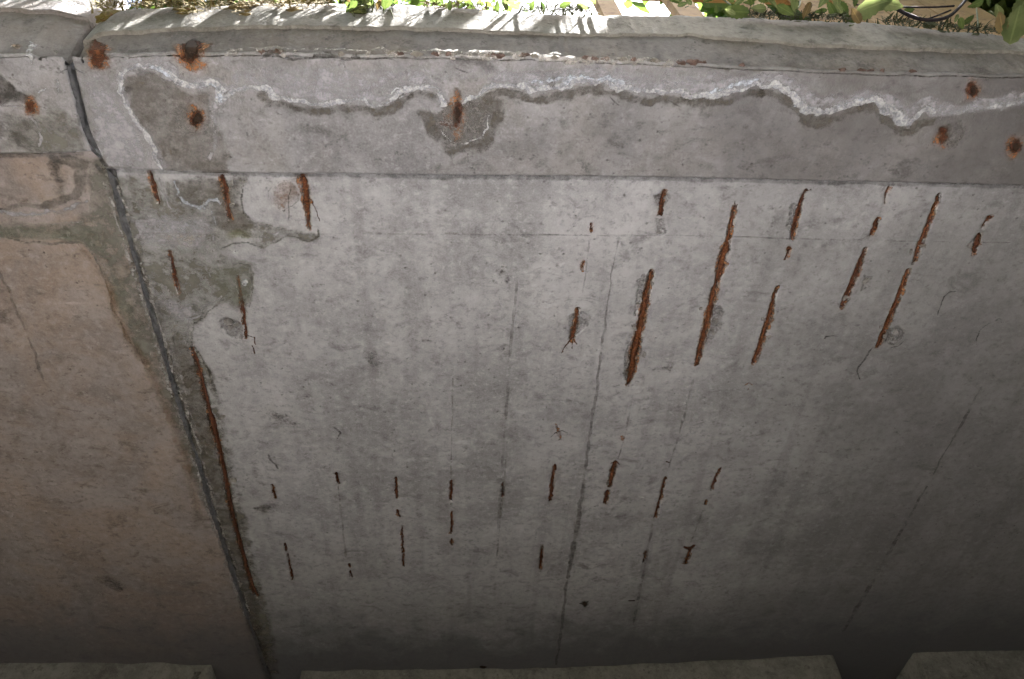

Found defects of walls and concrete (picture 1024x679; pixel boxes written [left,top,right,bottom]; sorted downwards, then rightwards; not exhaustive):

rust [173,39,211,72]
leakage [462,68,1024,136]
rust [296,174,320,229]
rust [657,189,667,233]
rust [783,189,811,260]
rust [694,202,738,366]
rust [840,247,872,310]
rust [875,193,941,347]
rust [561,307,588,353]
rust [623,269,654,385]
rust [751,285,780,365]
rust [189,347,259,596]